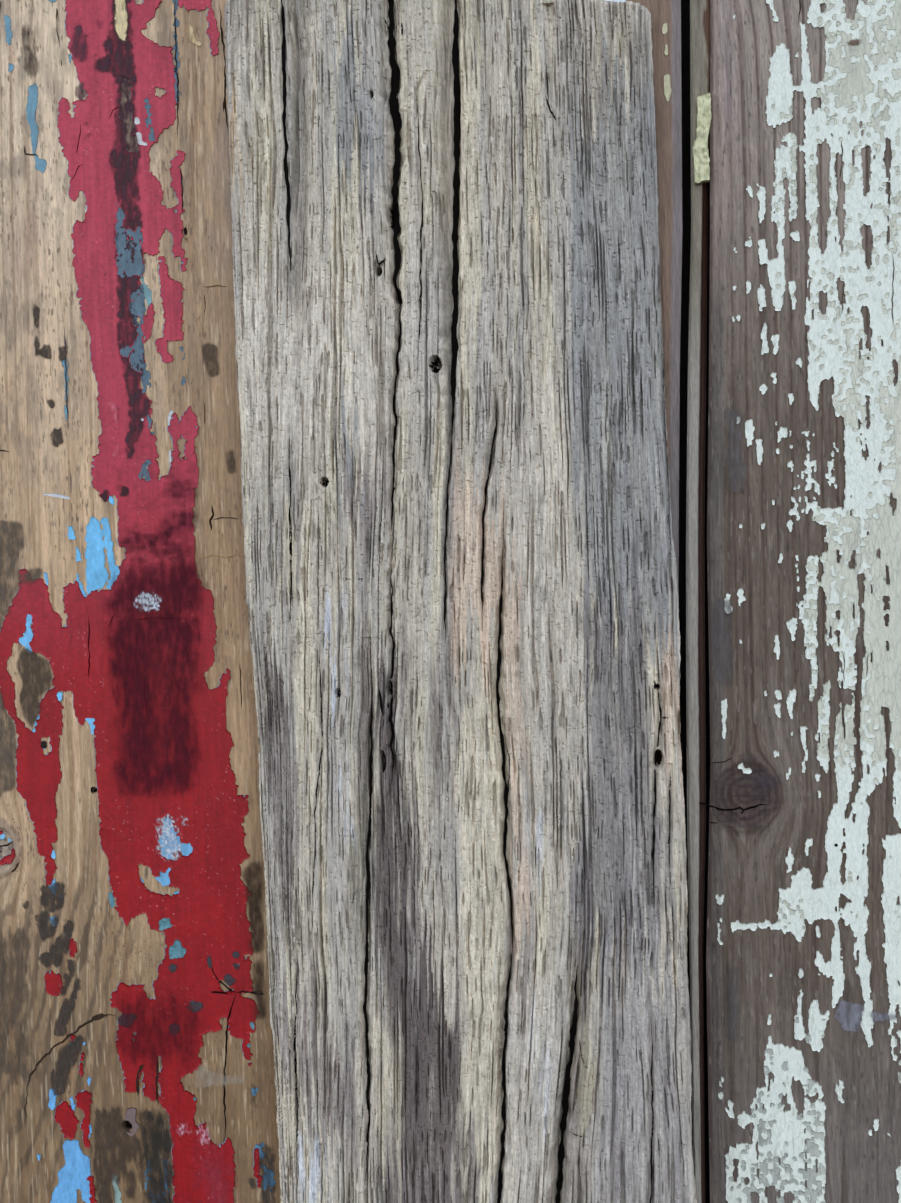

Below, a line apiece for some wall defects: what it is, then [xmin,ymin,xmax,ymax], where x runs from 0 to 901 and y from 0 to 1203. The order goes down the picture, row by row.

crack [376,0,423,537]
crack [444,0,461,639]
peeling [693,93,712,185]
peeling [0,0,259,1203]
crack [211,968,264,1143]
peeling [252,1142,276,1192]
crack [481,408,513,1203]
crack [555,965,588,1203]
peeling [715,0,901,1203]